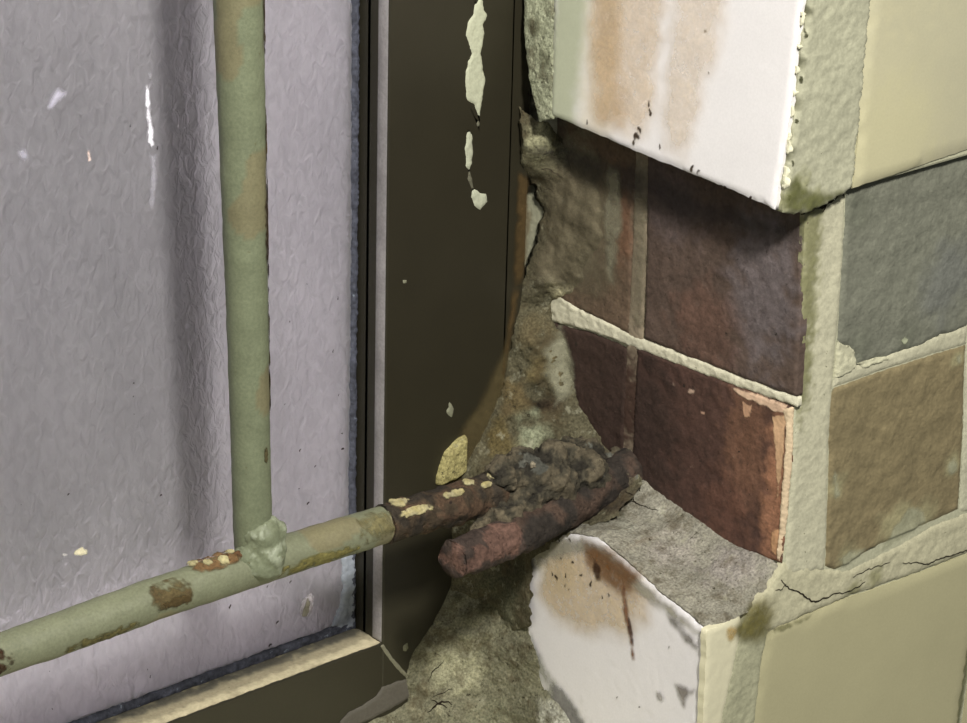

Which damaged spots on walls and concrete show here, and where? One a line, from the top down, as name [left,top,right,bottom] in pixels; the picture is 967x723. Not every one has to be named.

peeling [443,473,493,499]
corrosion [469,436,631,531]
crack [778,550,967,603]